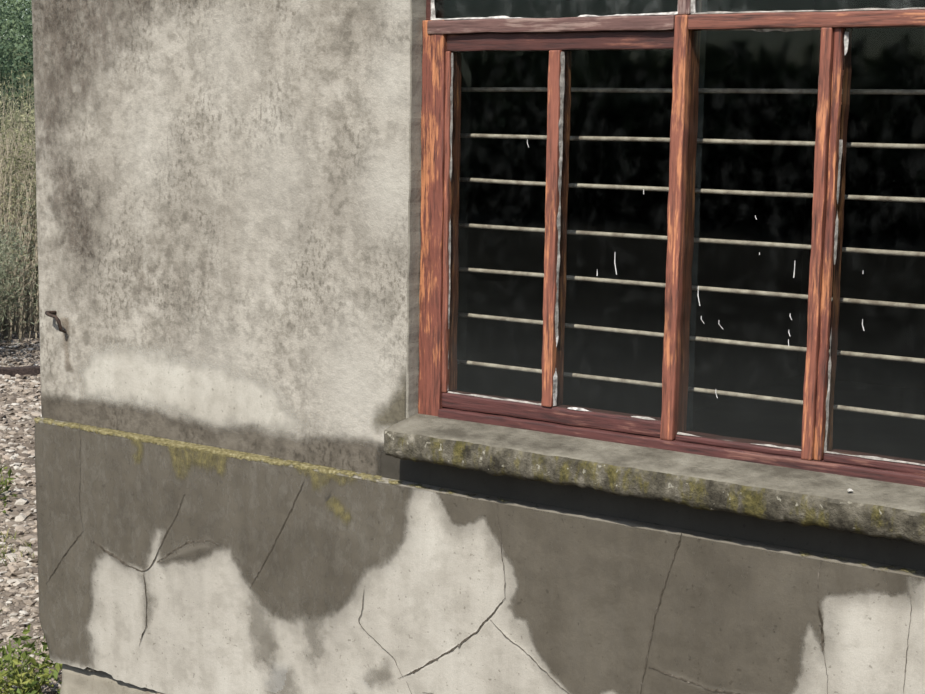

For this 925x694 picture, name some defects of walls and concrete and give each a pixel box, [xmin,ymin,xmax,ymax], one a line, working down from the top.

water stain [375,375,406,425]
crack [46,425,218,645]
crack [250,478,305,588]
crack [358,501,569,694]
water stain [35,397,925,694]
crack [640,532,757,694]
crack [817,562,828,694]
crack [903,594,912,693]